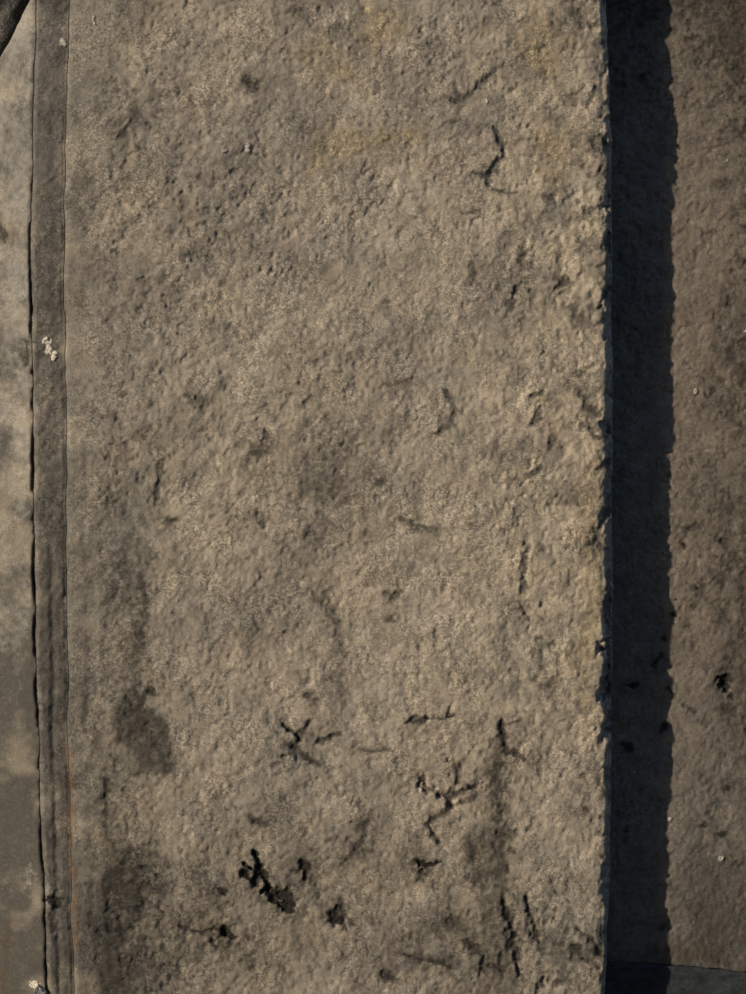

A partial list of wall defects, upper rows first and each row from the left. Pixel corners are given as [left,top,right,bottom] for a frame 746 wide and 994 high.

crack [462,127,518,215]
crack [435,389,457,436]
leakage [113,684,174,776]
crack [283,721,341,767]
crack [418,763,477,844]
leakage [467,720,511,936]